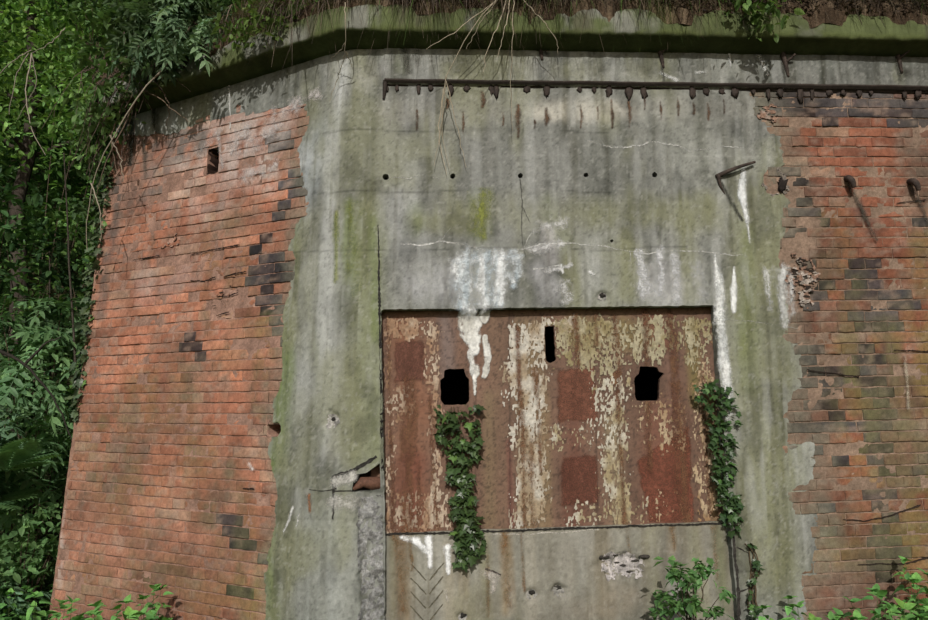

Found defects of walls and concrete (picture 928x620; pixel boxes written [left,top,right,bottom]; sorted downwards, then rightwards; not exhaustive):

peeling [353,316,452,620]
corrosion [388,340,425,562]
efflorescence [451,242,564,395]
corrosion [516,328,542,487]
corrosion [557,315,598,422]
corrosion [561,455,599,505]
corrosion [610,318,621,424]
corrosion [638,311,694,532]
efflorescence [714,255,737,419]
efflorescence [764,265,794,328]
spalling [784,252,820,309]
spalling [599,550,650,581]